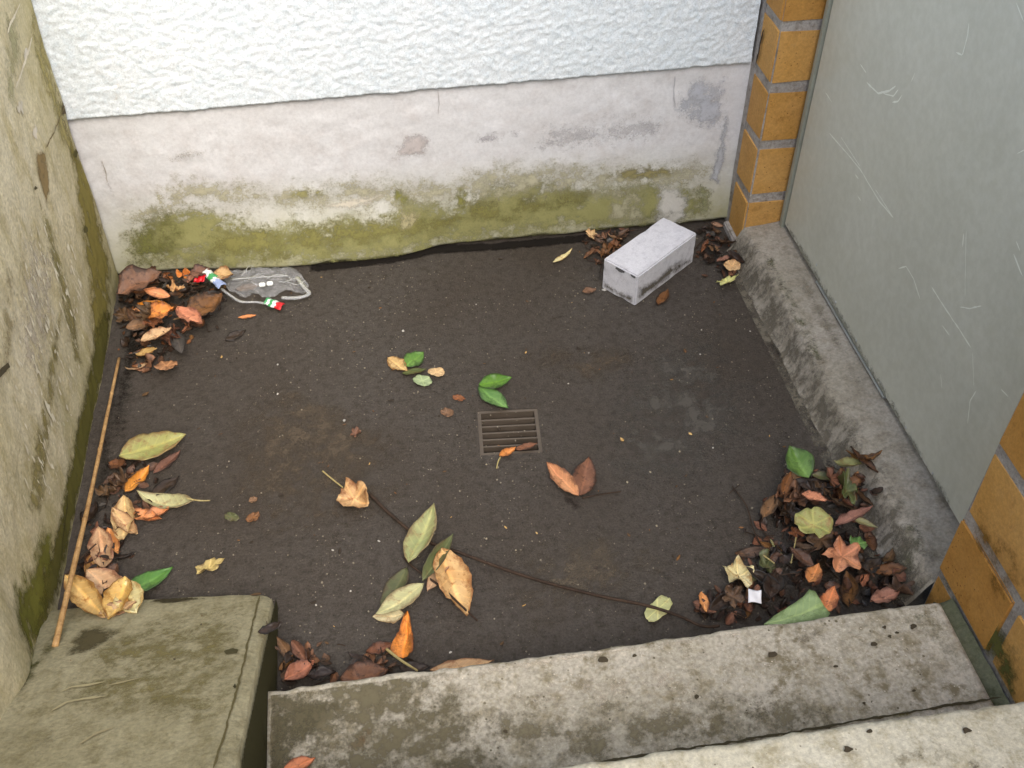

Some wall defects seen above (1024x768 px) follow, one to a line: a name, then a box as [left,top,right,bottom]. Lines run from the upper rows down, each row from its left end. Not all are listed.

damp [37,152,49,200]